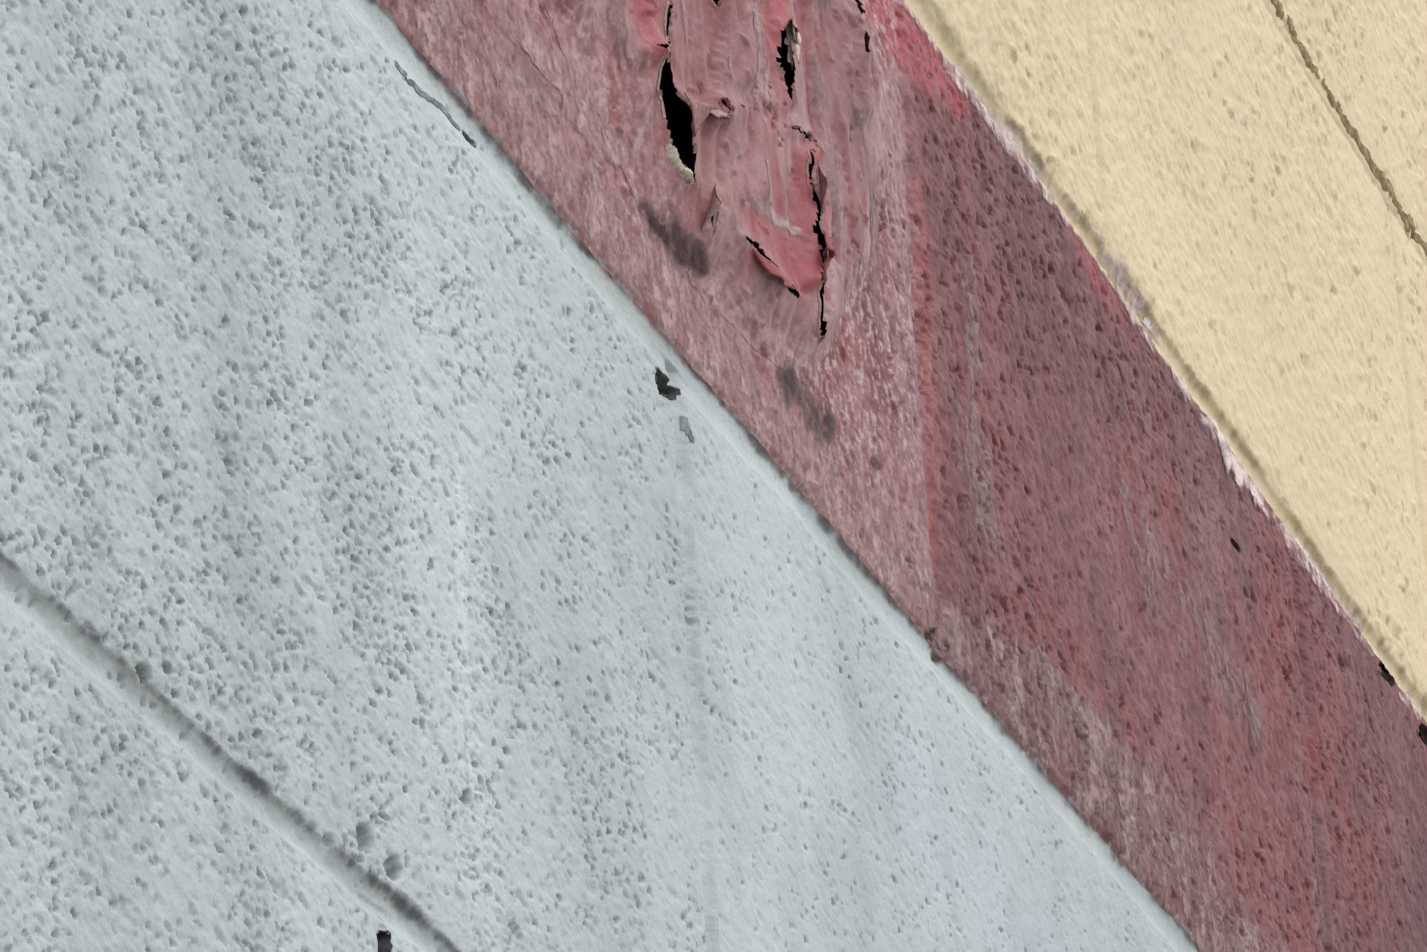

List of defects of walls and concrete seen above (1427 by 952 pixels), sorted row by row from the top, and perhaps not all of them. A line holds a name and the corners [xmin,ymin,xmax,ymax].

peeling [544,0,895,383]
peeling [892,0,1161,350]
spalling [655,367,681,400]